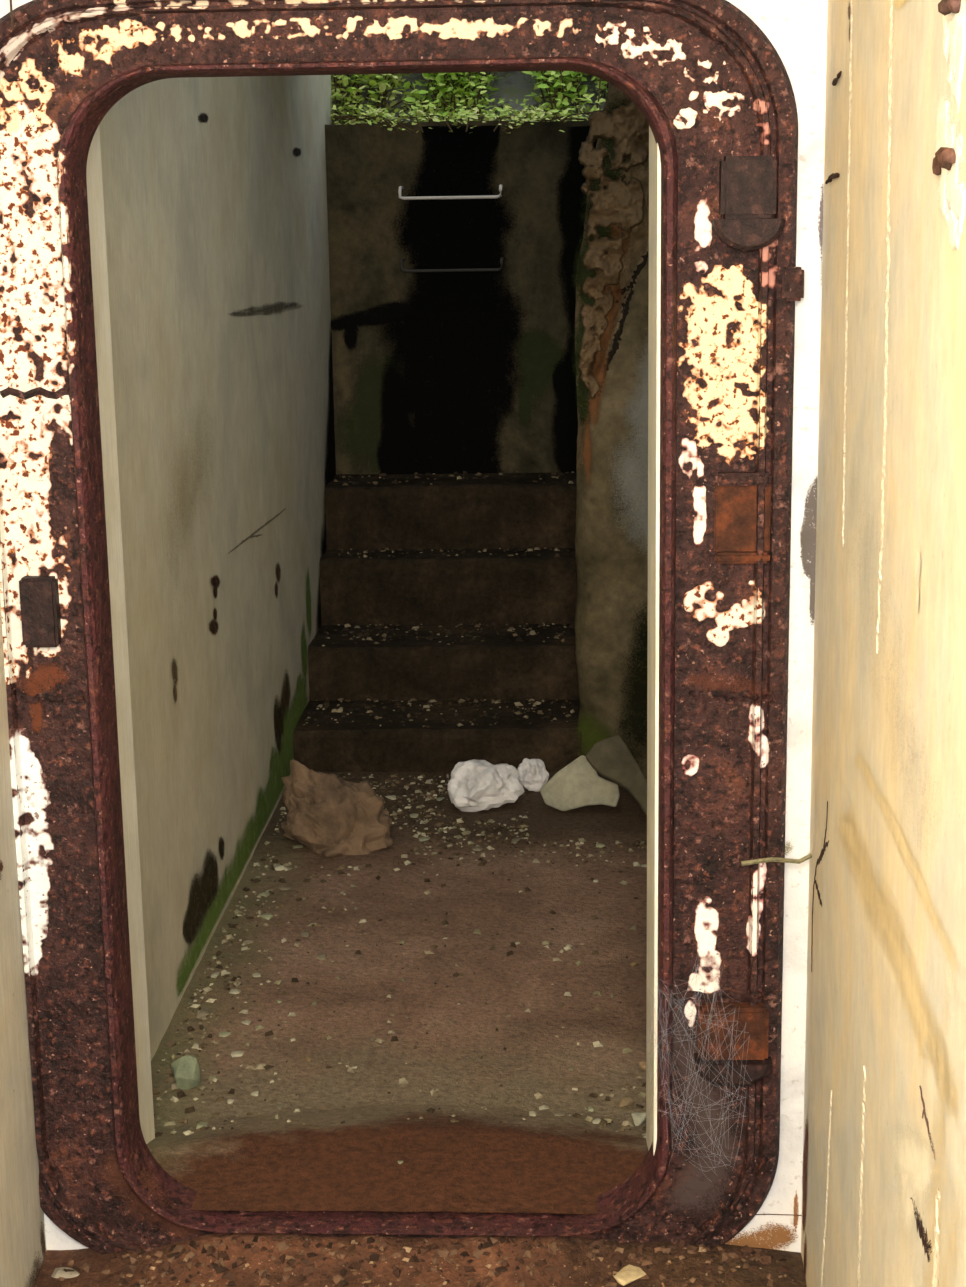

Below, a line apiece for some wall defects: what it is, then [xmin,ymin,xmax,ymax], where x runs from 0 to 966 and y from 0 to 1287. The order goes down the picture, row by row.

corrosion [932,147,956,175]
peeling [0,0,778,685]
corrosion [582,224,634,487]
corrosion [209,576,221,636]
corrosion [14,662,70,733]
corrosion [171,656,179,702]
peeling [9,728,54,976]